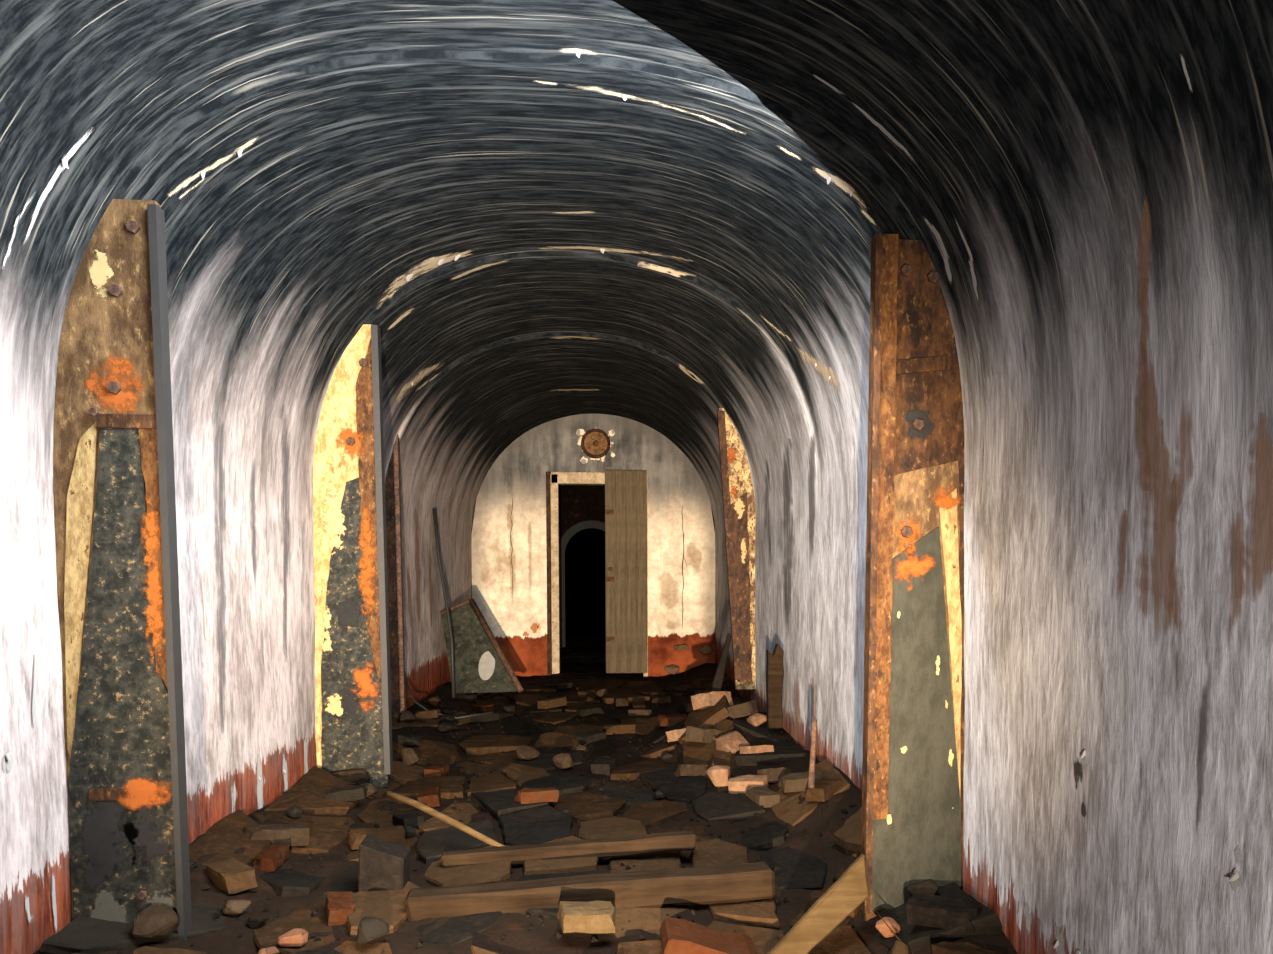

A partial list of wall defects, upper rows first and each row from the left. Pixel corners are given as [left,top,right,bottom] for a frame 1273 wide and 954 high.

spalling [561,48,596,57]
spalling [581,87,742,133]
peeling [813,75,915,164]
spalling [815,168,876,225]
spalling [380,251,506,301]
spalling [540,246,694,277]
corrosion [86,356,143,413]
spalling [396,364,441,402]
corrosion [934,486,960,509]
corrosion [895,517,934,590]
corrosion [142,498,163,662]
corrosion [119,778,171,810]